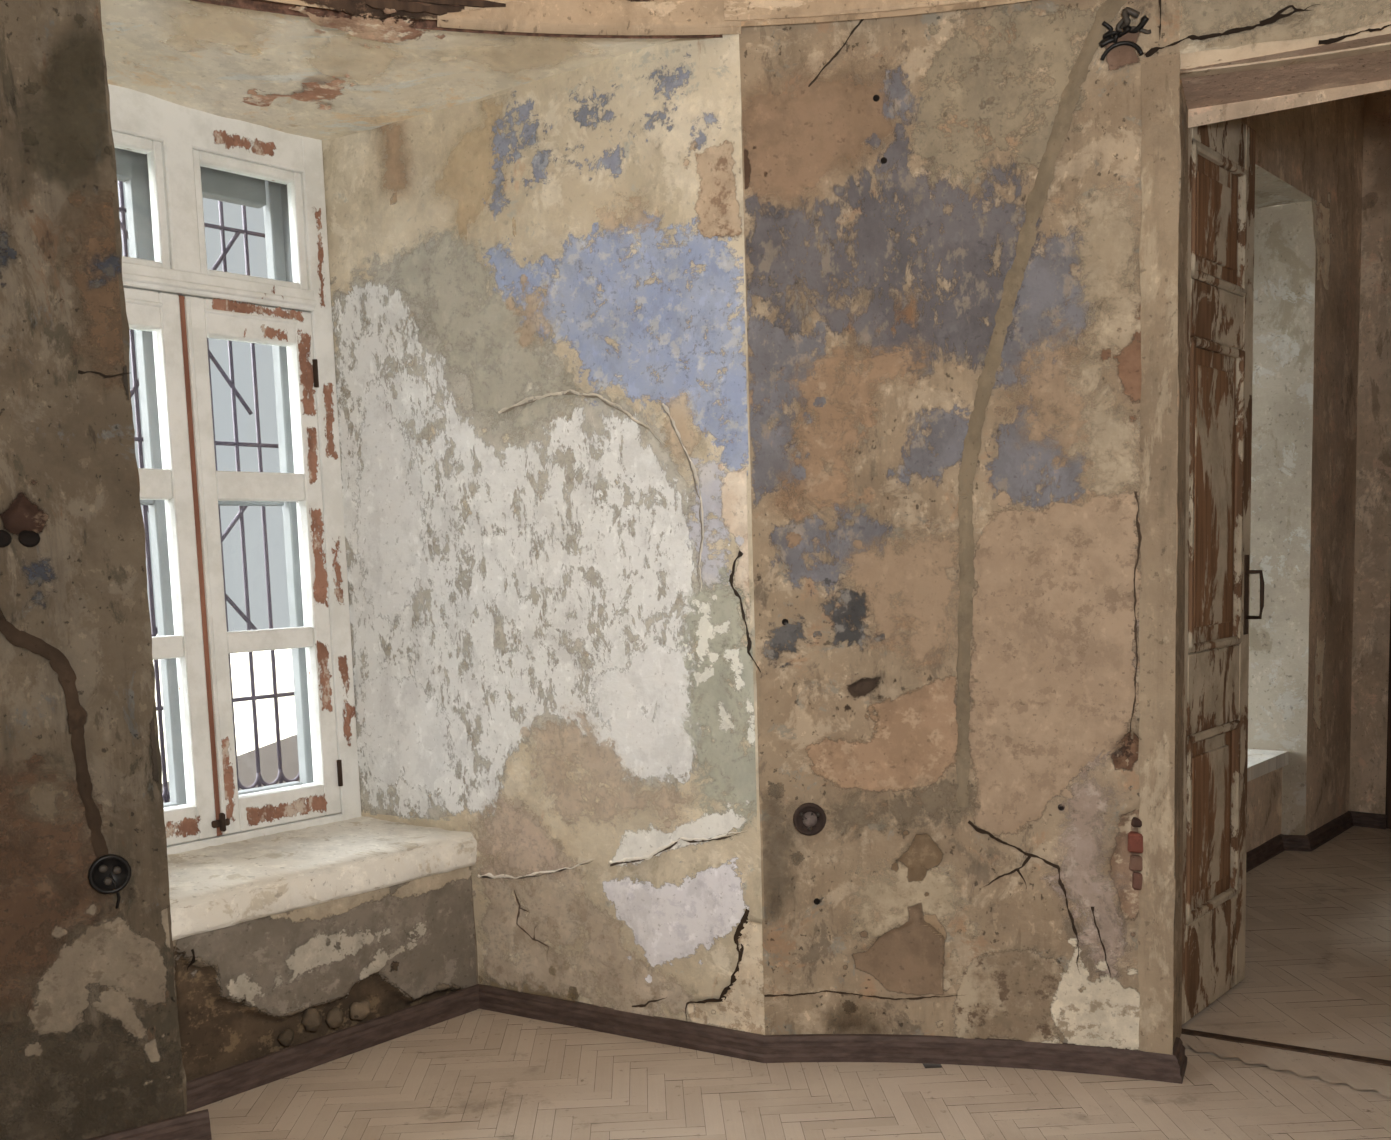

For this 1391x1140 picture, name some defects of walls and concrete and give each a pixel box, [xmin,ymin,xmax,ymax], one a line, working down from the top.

spalling [289,6,445,49]
crack [1145,0,1391,57]
peeling [88,254,121,289]
spalling [0,480,58,608]
peeling [331,226,822,839]
peeling [769,183,1143,978]
spalling [149,718,159,783]
flaking render [25,867,476,1085]
spalling [687,920,765,1035]
crack [632,909,962,1018]
spalling [843,824,1064,1044]
crack [968,820,1111,976]